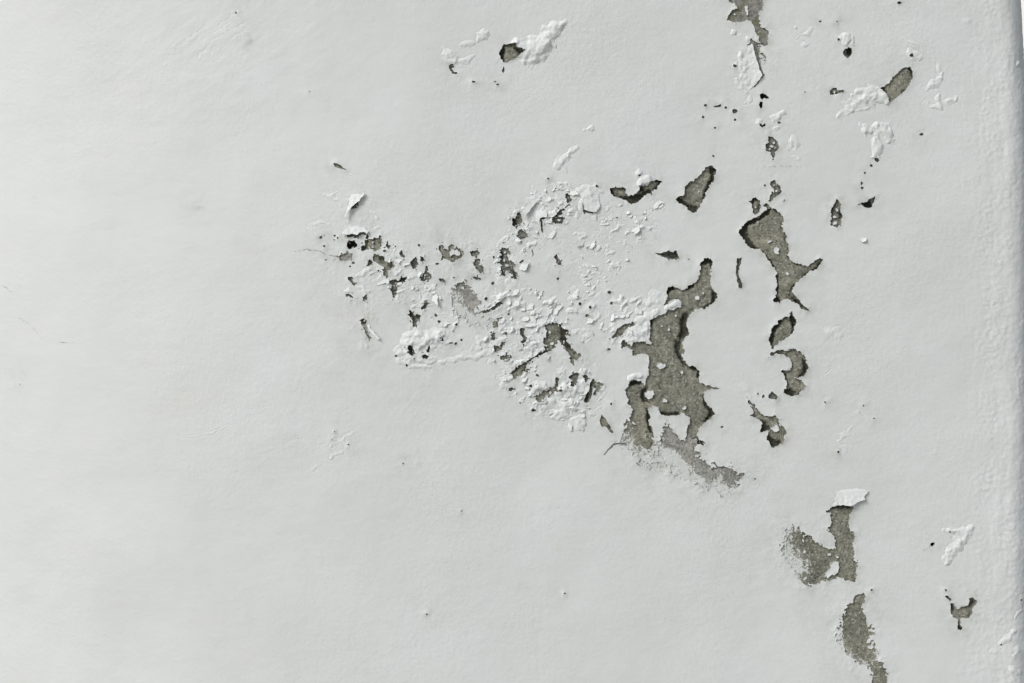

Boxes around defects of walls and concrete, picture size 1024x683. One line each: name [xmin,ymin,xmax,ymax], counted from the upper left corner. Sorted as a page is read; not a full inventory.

peeling [727,0,769,108]
peeling [880,53,913,102]
peeling [319,155,756,498]
peeling [739,180,823,448]
peeling [780,488,890,683]
peeling [945,589,977,630]